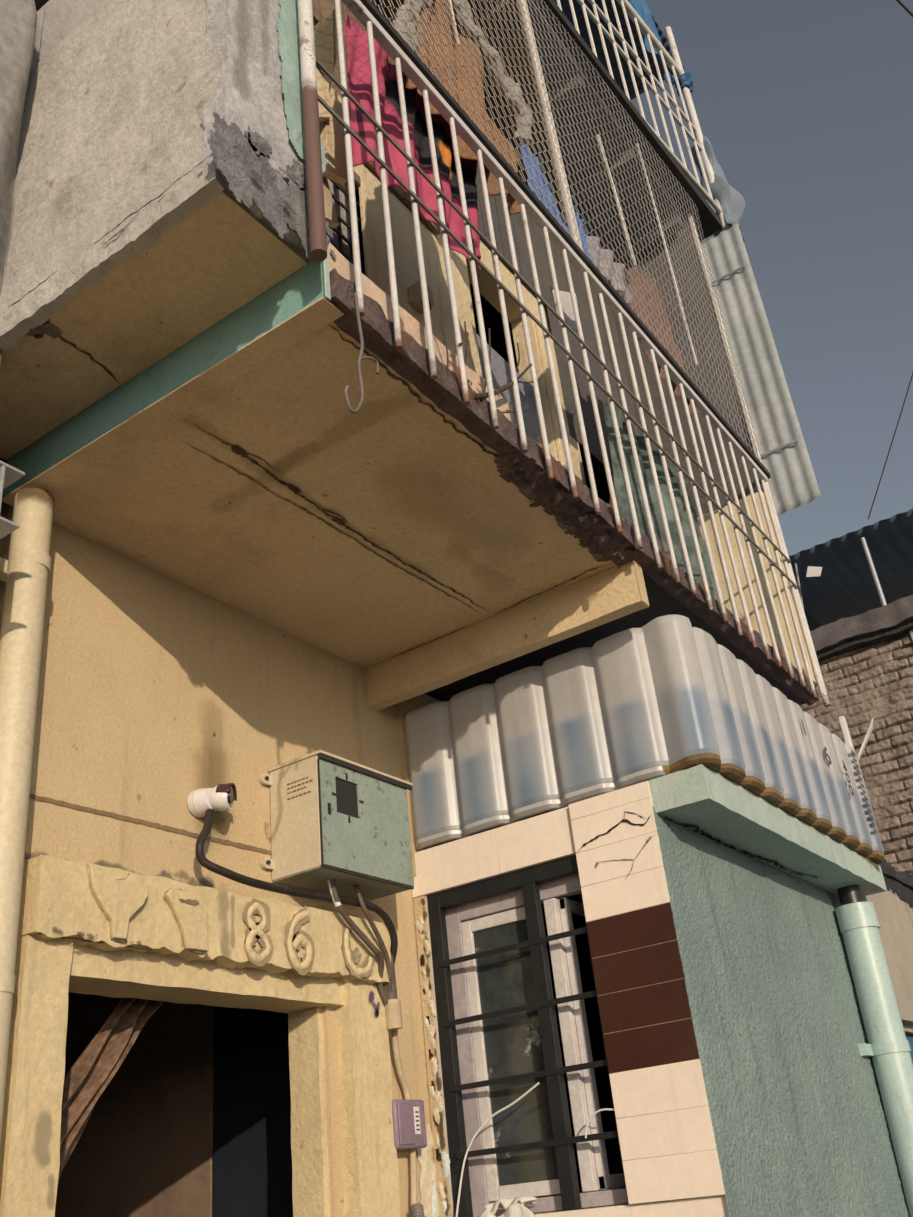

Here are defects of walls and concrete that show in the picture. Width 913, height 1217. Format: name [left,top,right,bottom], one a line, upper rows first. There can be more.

flaking render [200,0,314,261]
crack [85,153,213,251]
crack [4,271,118,382]
spalling [391,308,412,352]
spalling [453,365,472,401]
crack [178,418,612,658]
spalling [494,437,639,566]
spalling [658,536,672,575]
spalling [777,643,810,686]
crack [575,811,817,880]
peeling [415,899,450,1217]